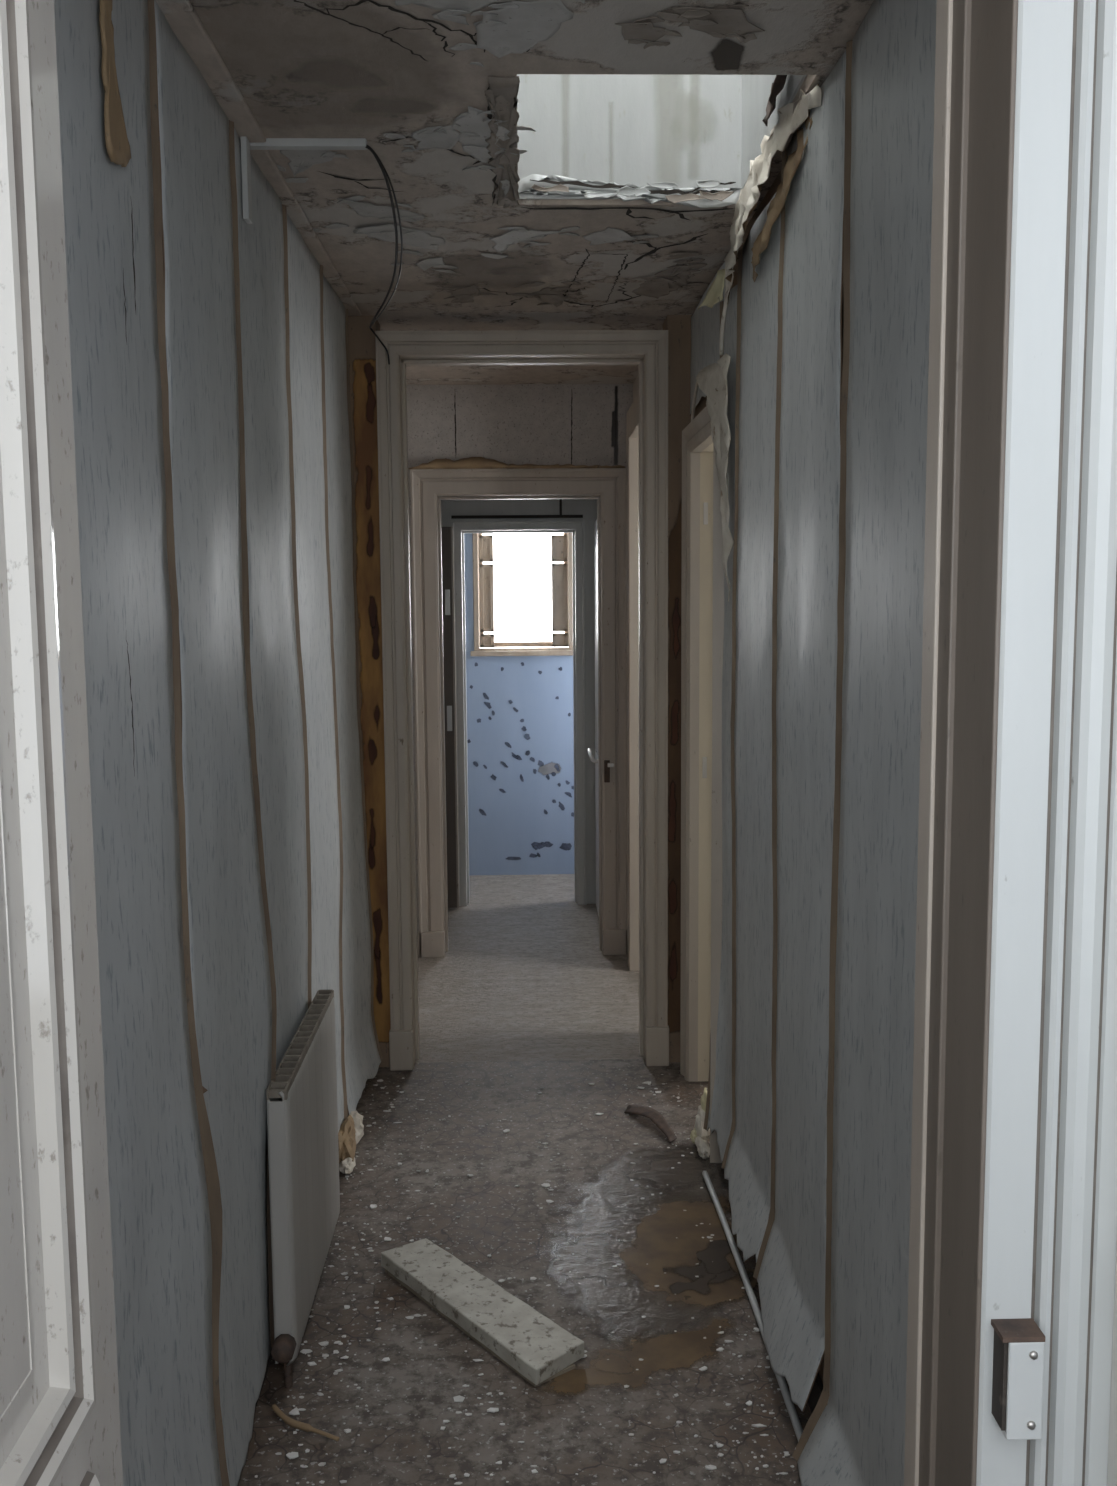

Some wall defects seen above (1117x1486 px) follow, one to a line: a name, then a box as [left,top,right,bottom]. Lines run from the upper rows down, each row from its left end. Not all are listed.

crack [294,0,485,61]
peeling [383,0,742,208]
crack [318,171,401,192]
peeling [481,226,659,259]
crack [447,141,736,308]